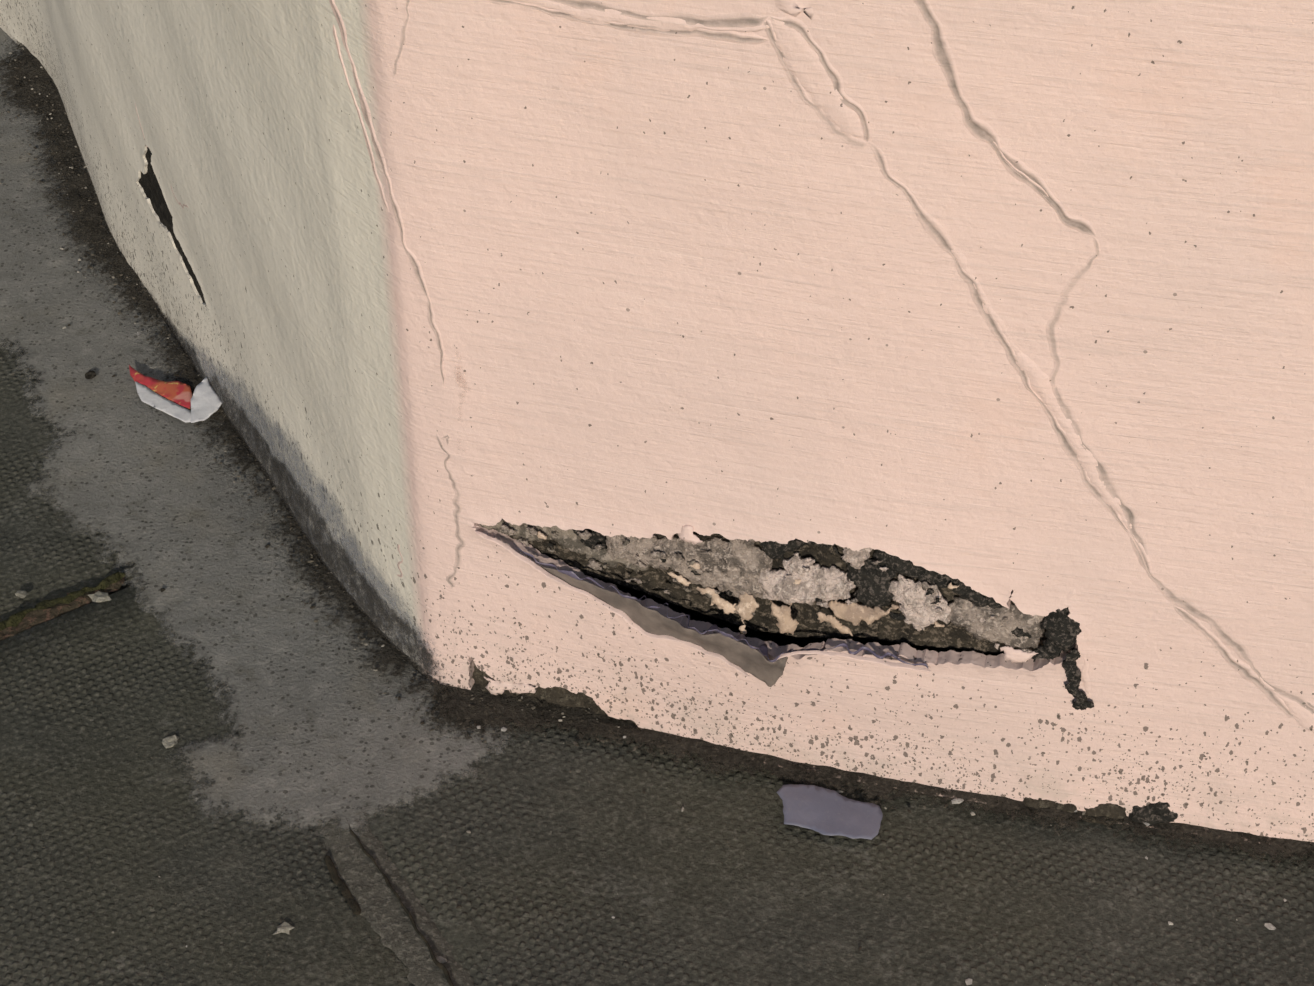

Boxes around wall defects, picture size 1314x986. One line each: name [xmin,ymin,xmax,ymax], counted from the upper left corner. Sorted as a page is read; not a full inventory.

crack [329,0,445,389]
crack [436,433,479,589]
crack [486,0,1314,733]